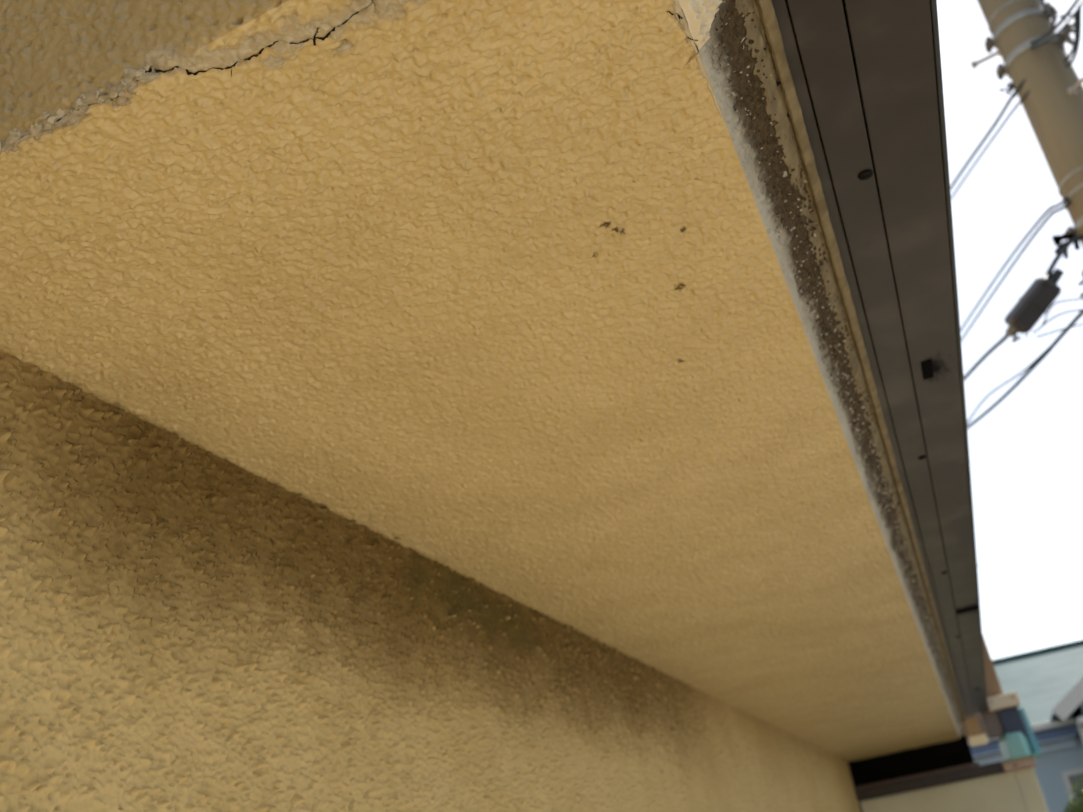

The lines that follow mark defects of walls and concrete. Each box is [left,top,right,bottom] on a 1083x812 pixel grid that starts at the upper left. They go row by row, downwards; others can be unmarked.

crack [145,0,376,77]
leakage [716,0,948,680]